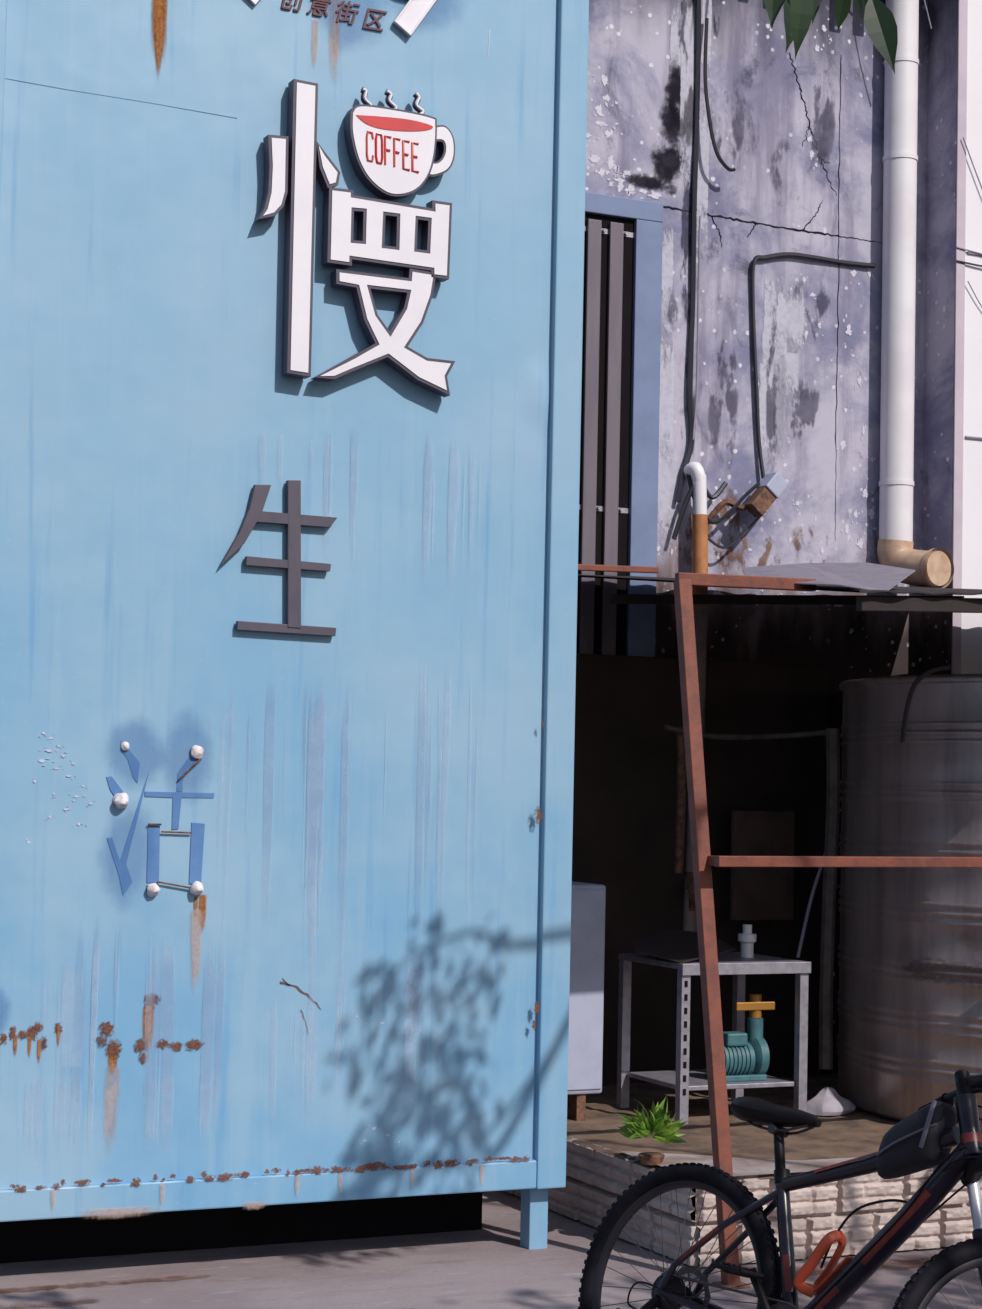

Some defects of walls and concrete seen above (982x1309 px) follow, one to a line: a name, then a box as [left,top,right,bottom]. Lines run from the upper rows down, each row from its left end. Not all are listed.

rust [152,0,167,70]
peeling [586,66,663,199]
water stain [812,88,835,161]
water stain [627,0,744,545]
crack [663,53,881,541]
water stain [759,279,828,456]
rust [194,895,206,928]
rust [0,1022,62,1060]
rust [95,993,203,1072]
rust [9,1156,530,1192]